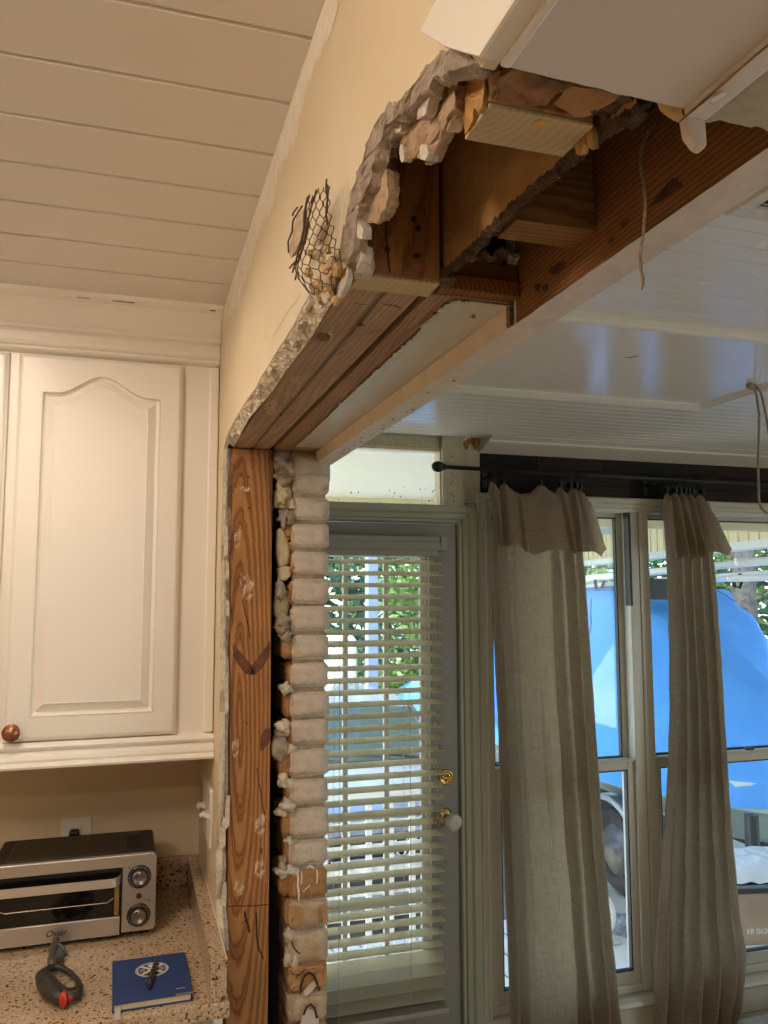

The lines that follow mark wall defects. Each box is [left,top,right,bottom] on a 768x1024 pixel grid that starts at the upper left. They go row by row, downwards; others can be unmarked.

flaking render [336,49,490,280]
peeling [294,300,476,447]
flaking render [212,292,332,1024]